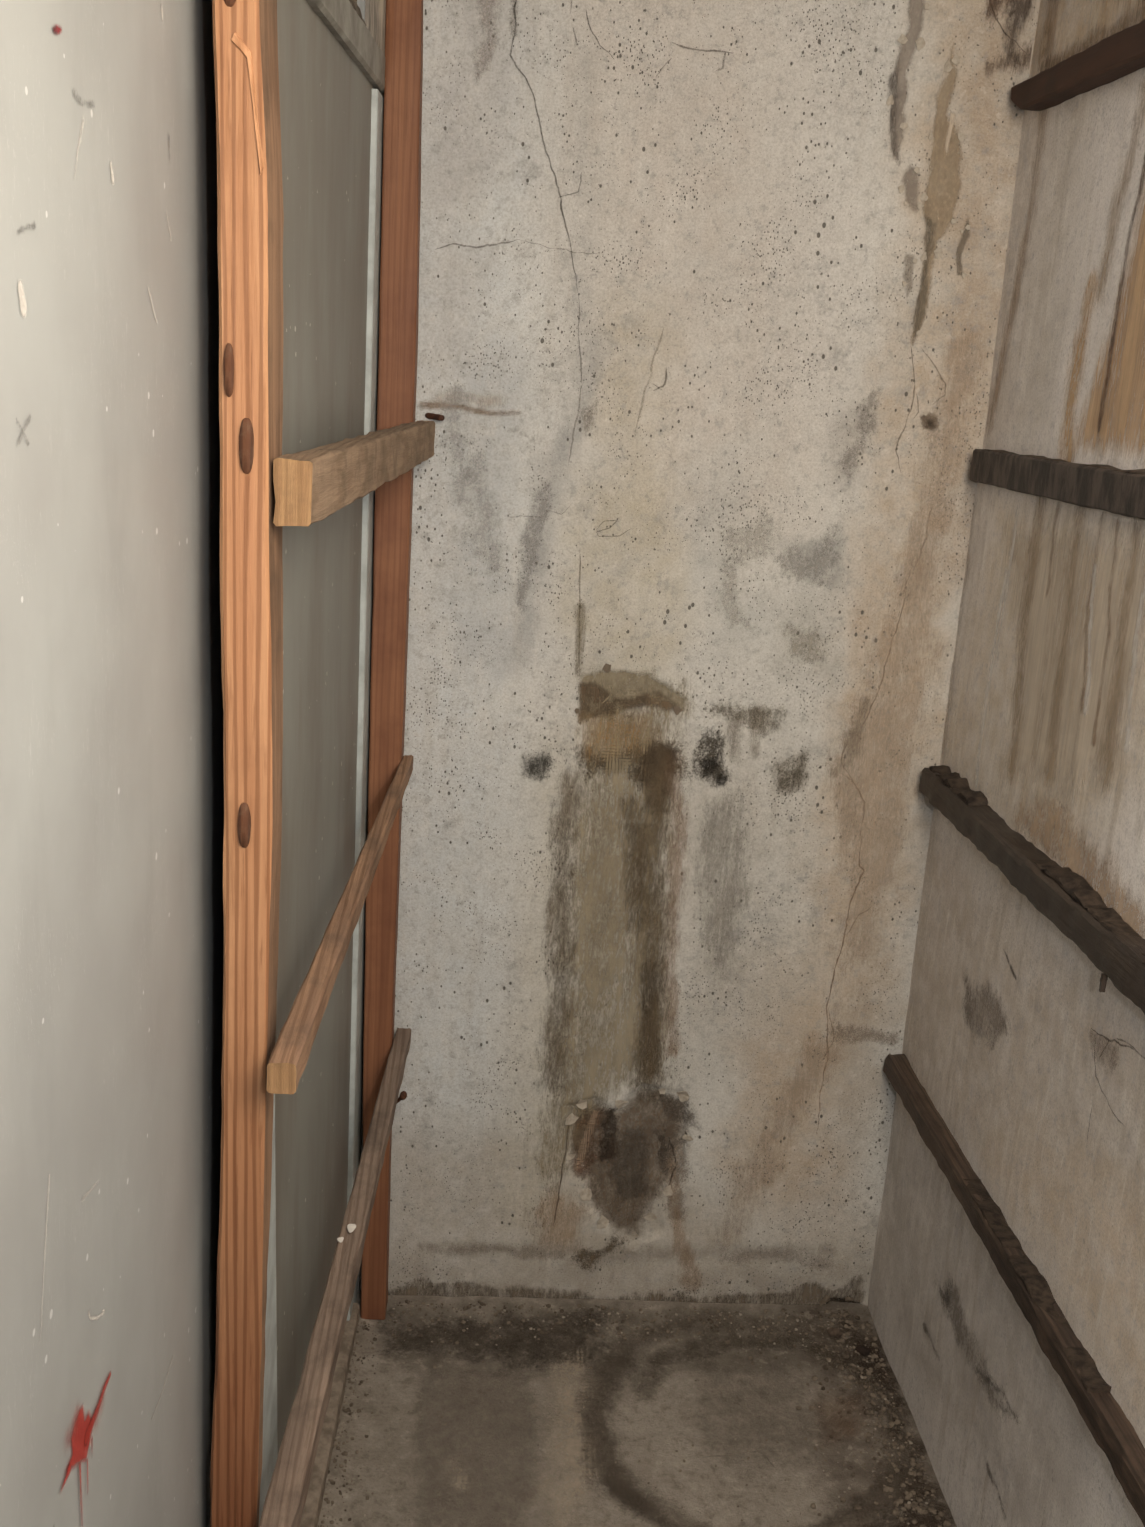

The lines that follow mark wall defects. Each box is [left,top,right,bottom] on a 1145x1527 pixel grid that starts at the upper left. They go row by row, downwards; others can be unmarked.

crack [478,0,594,296]
corrosion [1064,157,1145,462]
damp [778,752,807,791]
damp [522,683,785,1178]
damp [576,1237,623,1270]
damp [386,1278,952,1527]
damp [940,1281,1012,1412]